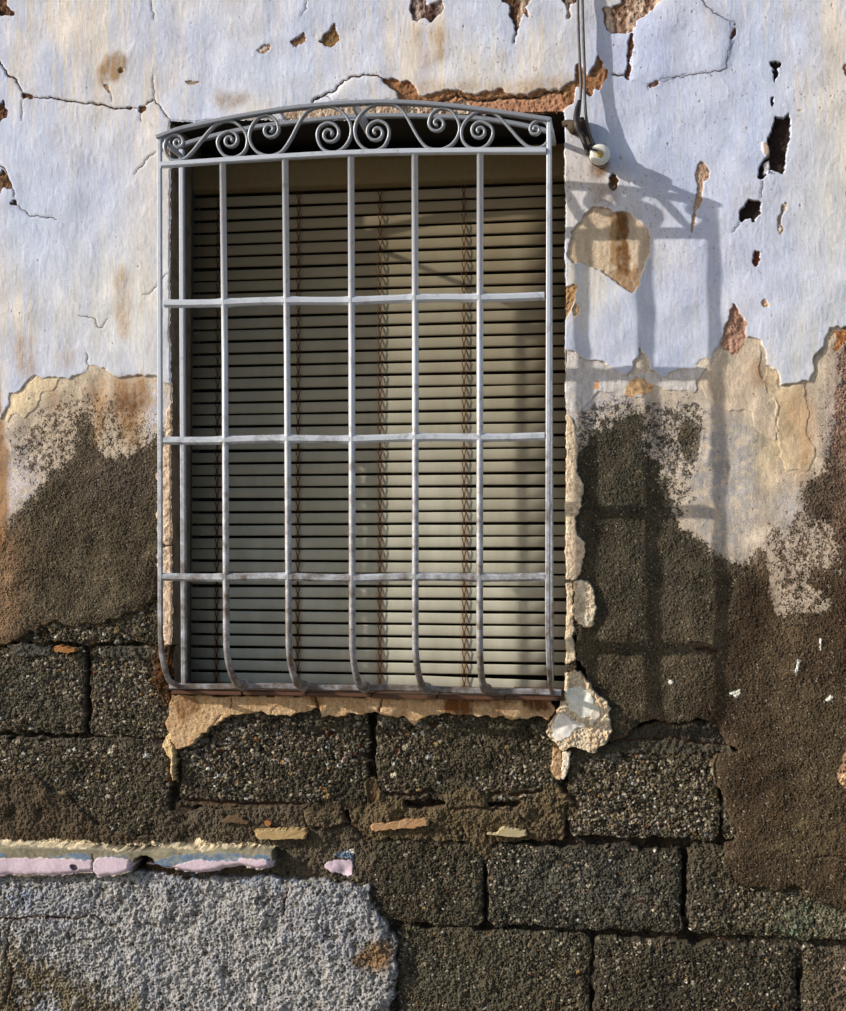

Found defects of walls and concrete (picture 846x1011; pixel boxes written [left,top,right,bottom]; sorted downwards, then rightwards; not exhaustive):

flaking render [410,0,444,23]
flaking render [502,0,531,35]
flaking render [602,0,662,81]
crack [611,0,734,87]
crack [0,61,170,121]
crack [312,74,385,103]
flaking render [758,97,792,179]
flaking render [0,365,173,530]
water stain [116,380,147,443]
flaking render [199,184,846,741]
water stain [0,421,14,635]
peeling [0,838,277,878]